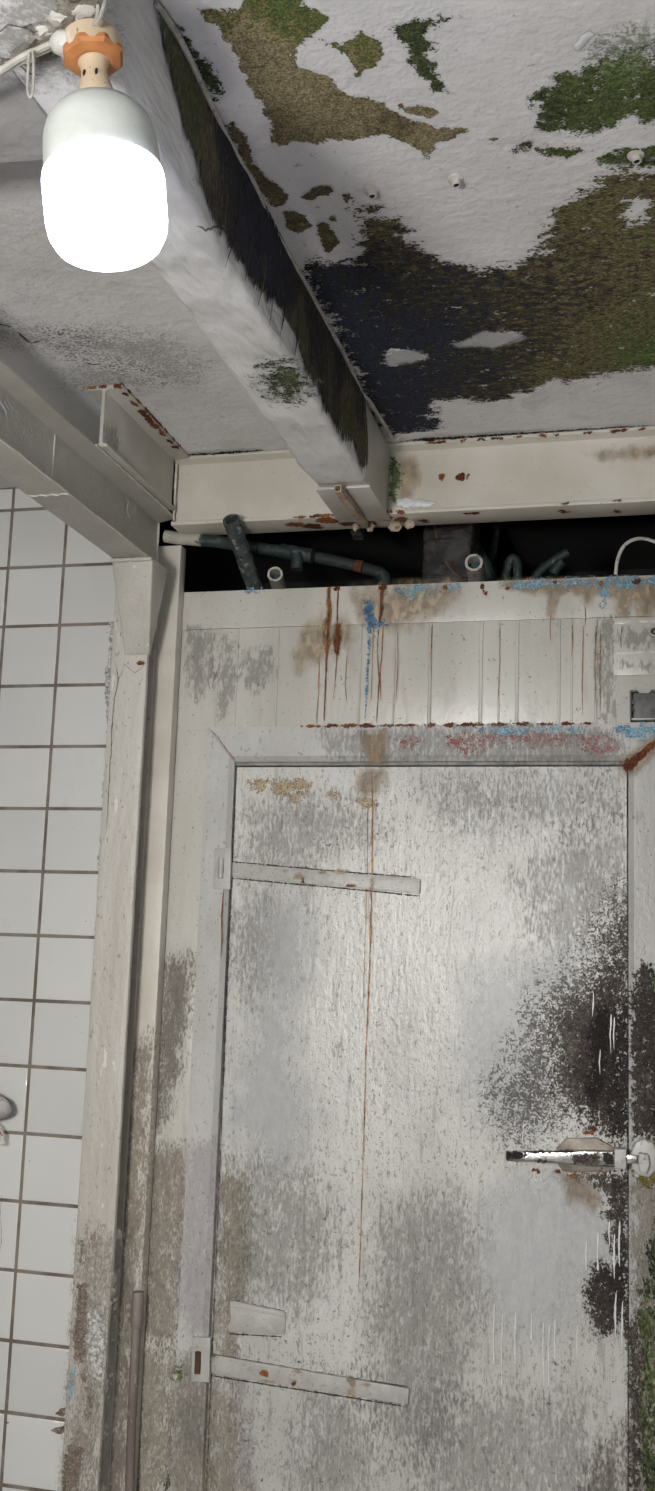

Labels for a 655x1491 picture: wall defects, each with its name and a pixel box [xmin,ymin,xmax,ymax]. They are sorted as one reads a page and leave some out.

peeling [198,0,468,159]
peeling [224,121,353,253]
damp [158,11,655,469]
rust [439,472,470,481]
rust [428,433,559,444]
rust [300,583,591,729]
rust [622,738,655,772]
damp [156,952,196,1125]
mould [480,874,655,1151]
damp [136,1146,254,1491]
mould [566,1169,629,1359]
damp [584,1419,629,1491]